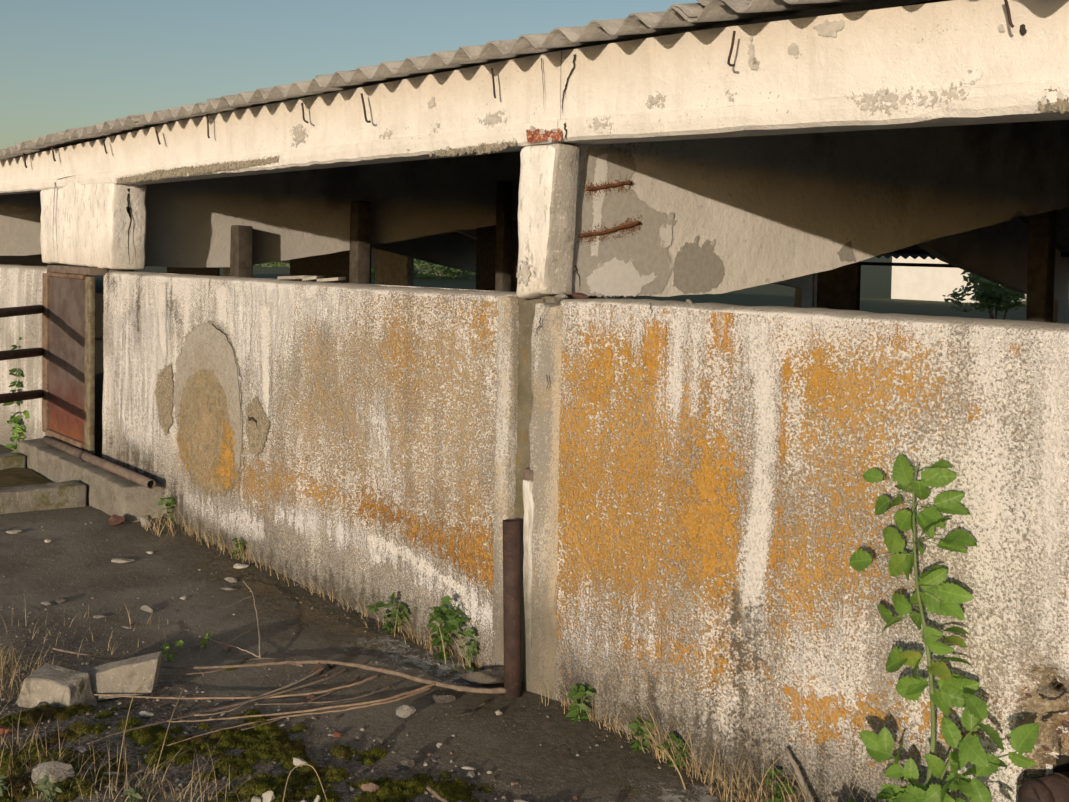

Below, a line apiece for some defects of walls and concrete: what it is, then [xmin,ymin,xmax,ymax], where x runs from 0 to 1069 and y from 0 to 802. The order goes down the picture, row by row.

crack [125,188,133,265]
spalling [116,155,280,184]
spalling [429,126,562,157]
crack [541,54,576,138]
rust [584,176,633,200]
rust [579,216,642,246]
peeling [572,117,724,298]
peeling [155,320,270,511]
damp [105,273,495,686]
damp [556,303,937,802]
damp [806,319,1069,681]
spalling [995,661,1069,788]